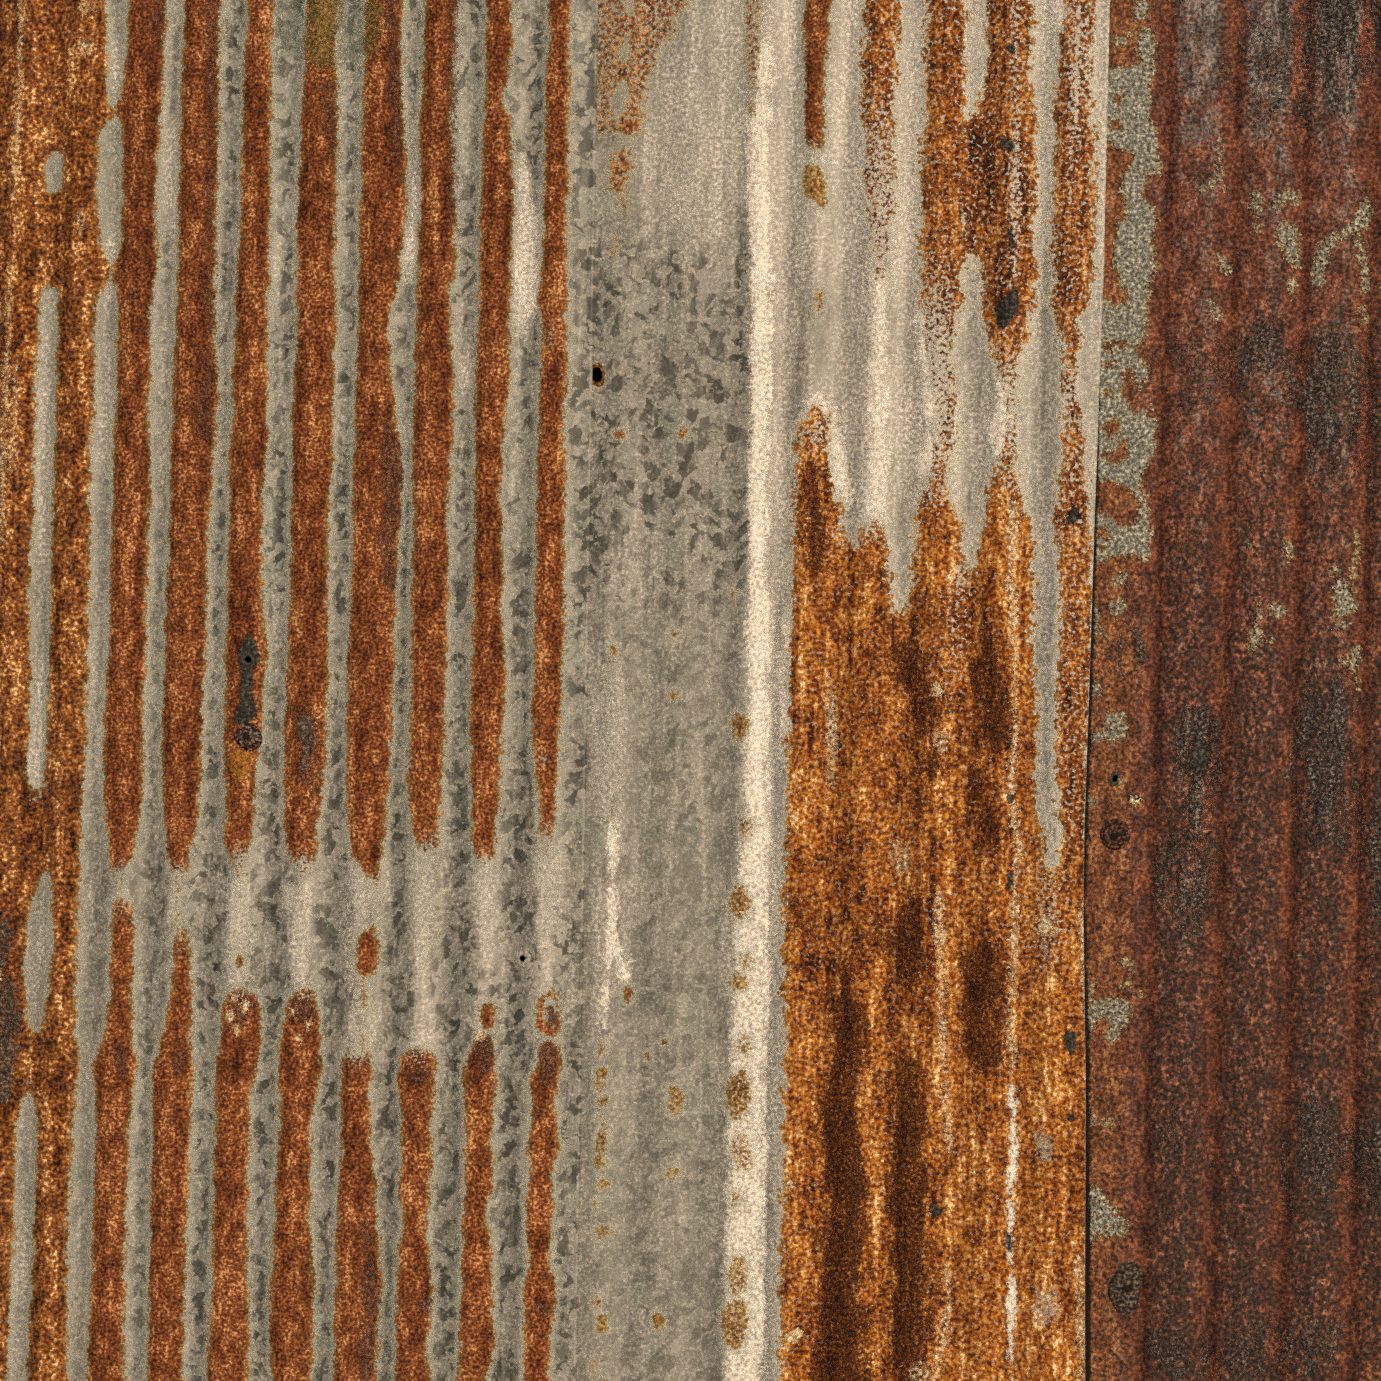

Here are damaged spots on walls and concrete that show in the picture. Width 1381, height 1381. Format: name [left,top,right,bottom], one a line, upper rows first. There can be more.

corrosion [596,0,689,215]
peeling [1094,0,1164,641]
corrosion [0,0,577,1381]
corrosion [723,0,1106,1381]
peeling [1090,680,1130,743]
corrosion [618,981,636,1006]
corrosion [591,1038,616,1242]
corrosion [590,1290,612,1334]
corrosion [715,1254,753,1355]
corrosion [1108,1262,1143,1316]